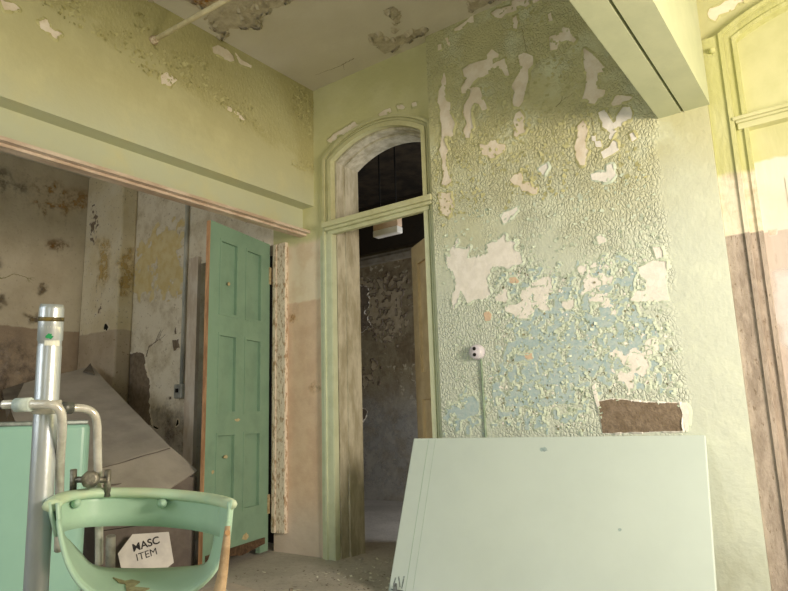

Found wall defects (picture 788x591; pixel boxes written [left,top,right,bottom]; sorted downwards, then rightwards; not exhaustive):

peeling [184,0,294,70]
peeling [368,6,429,54]
peeling [707,0,751,23]
peeling [430,0,693,437]
flaking render [360,272,411,348]
spalling [128,350,159,431]
flaking render [362,358,382,392]